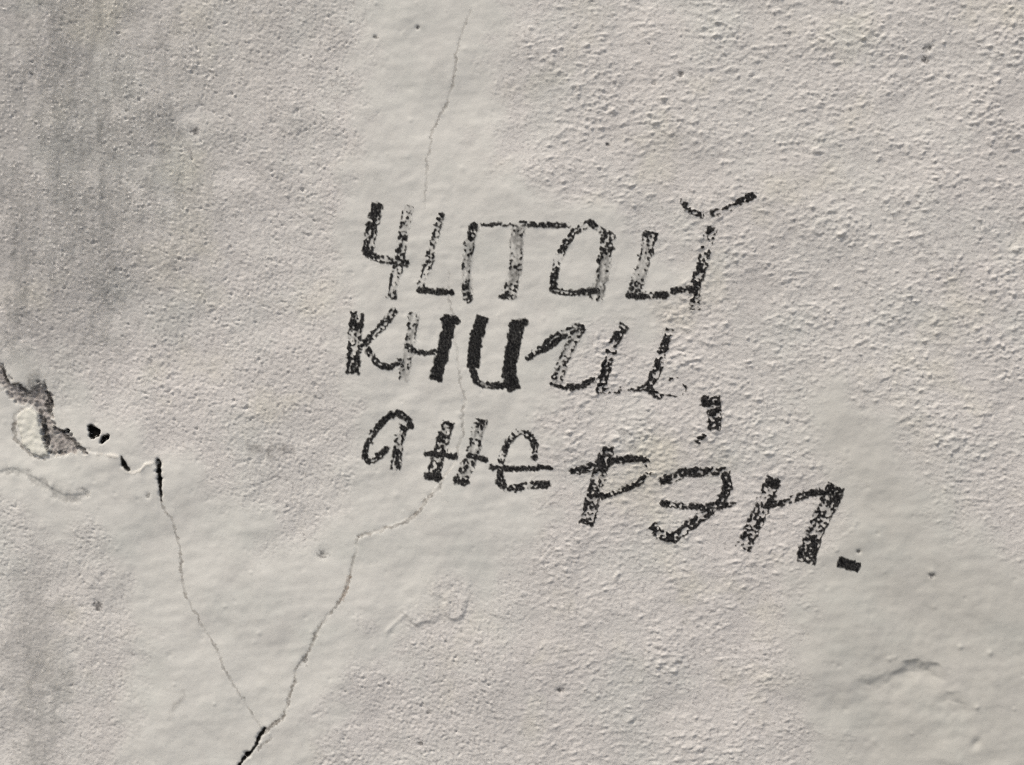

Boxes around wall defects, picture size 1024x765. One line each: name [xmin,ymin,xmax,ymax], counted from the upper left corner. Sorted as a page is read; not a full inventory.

spalling [0,366,87,456]
crack [155,459,163,501]
crack [238,635,315,765]